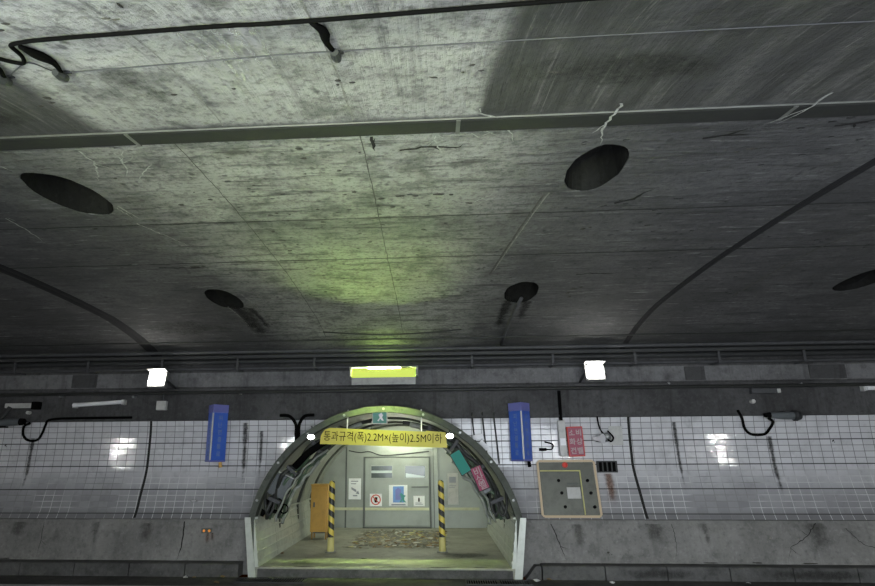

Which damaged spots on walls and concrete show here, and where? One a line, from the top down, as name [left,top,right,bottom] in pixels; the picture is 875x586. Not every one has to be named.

crack [400,108,513,153]
crack [593,103,623,144]